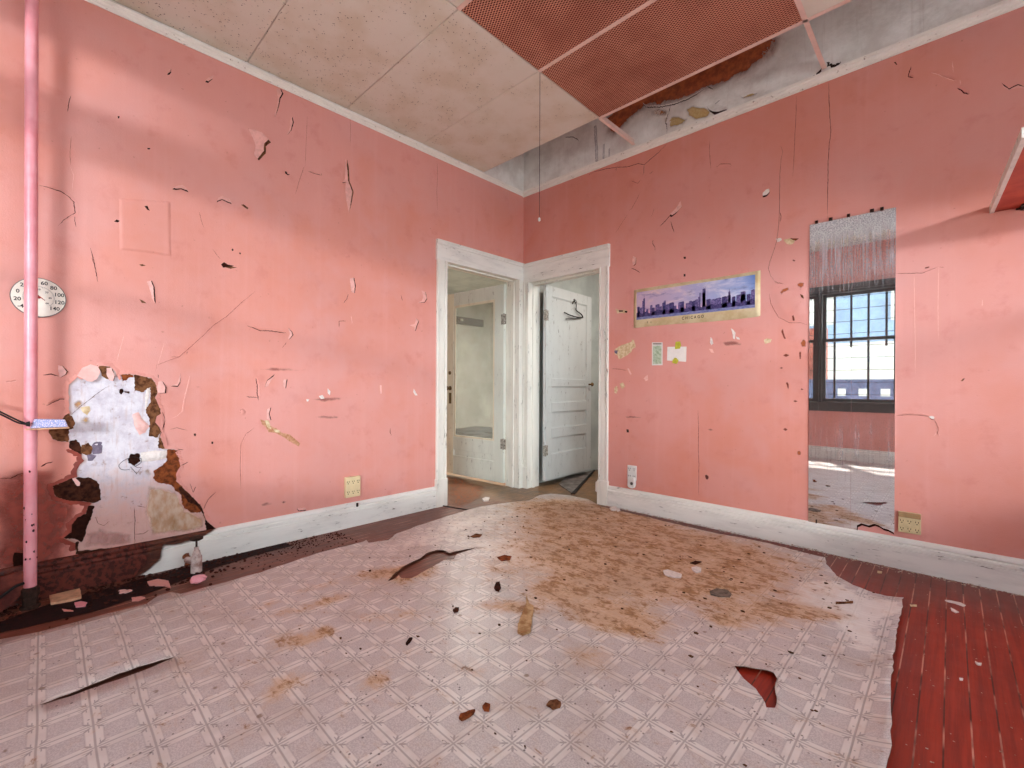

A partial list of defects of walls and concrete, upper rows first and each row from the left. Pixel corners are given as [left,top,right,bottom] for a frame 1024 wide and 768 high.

crack [39,144,80,226]
peeling [249,129,271,160]
peeling [343,159,354,211]
peeling [707,103,728,115]
crack [768,120,796,284]
crack [825,103,833,210]
peeling [140,281,156,303]
crack [155,291,286,418]
flaking render [43,362,215,554]